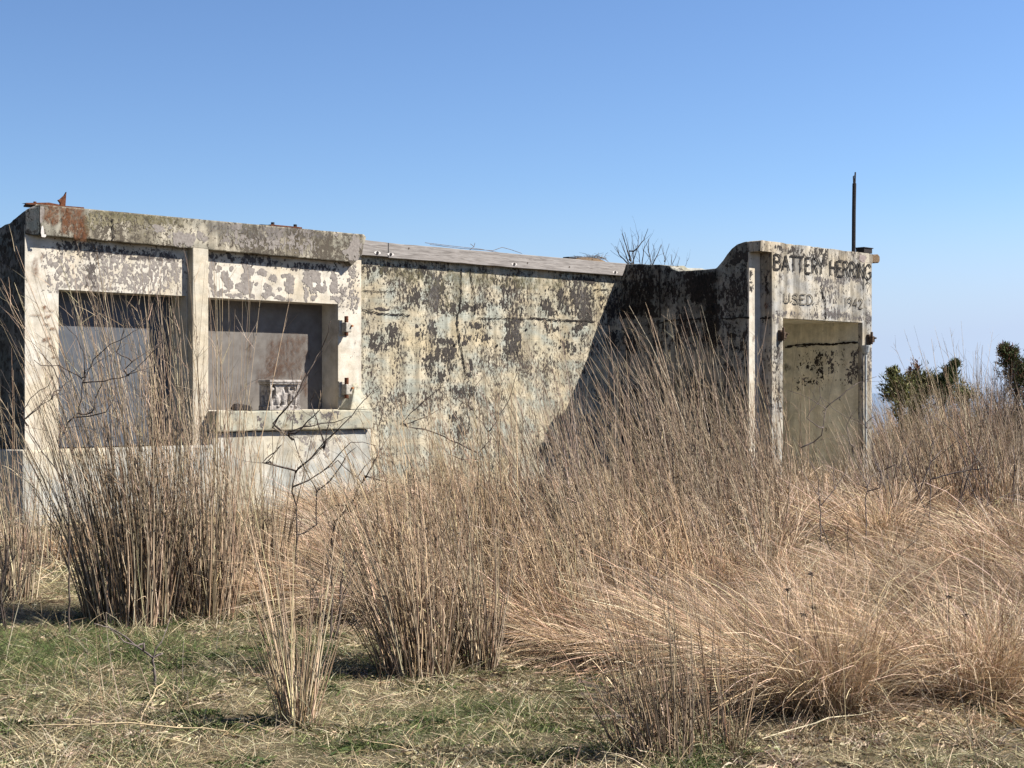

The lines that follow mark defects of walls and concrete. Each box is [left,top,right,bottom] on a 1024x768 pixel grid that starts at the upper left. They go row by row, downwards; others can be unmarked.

corrosion [45,206,87,240]
peeling [40,206,523,436]
crack [452,268,609,379]
peeling [773,244,872,391]